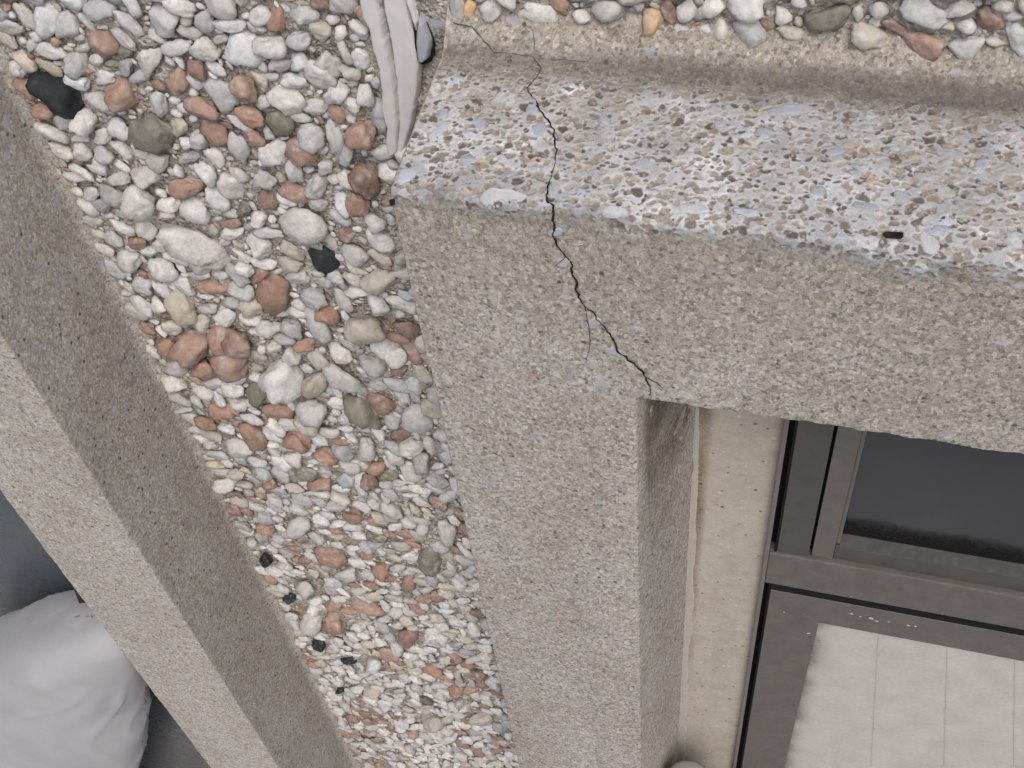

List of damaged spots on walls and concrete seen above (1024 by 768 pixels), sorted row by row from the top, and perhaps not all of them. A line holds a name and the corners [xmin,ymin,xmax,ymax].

crack [453,22,663,394]